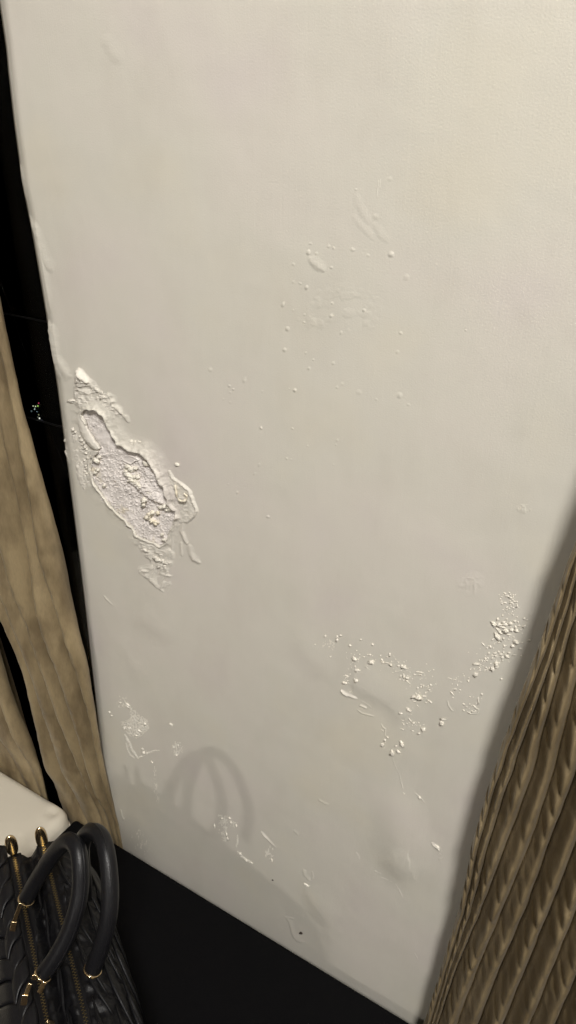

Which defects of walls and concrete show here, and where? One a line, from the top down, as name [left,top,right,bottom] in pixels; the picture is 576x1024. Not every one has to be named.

flaking render [64,395,199,595]